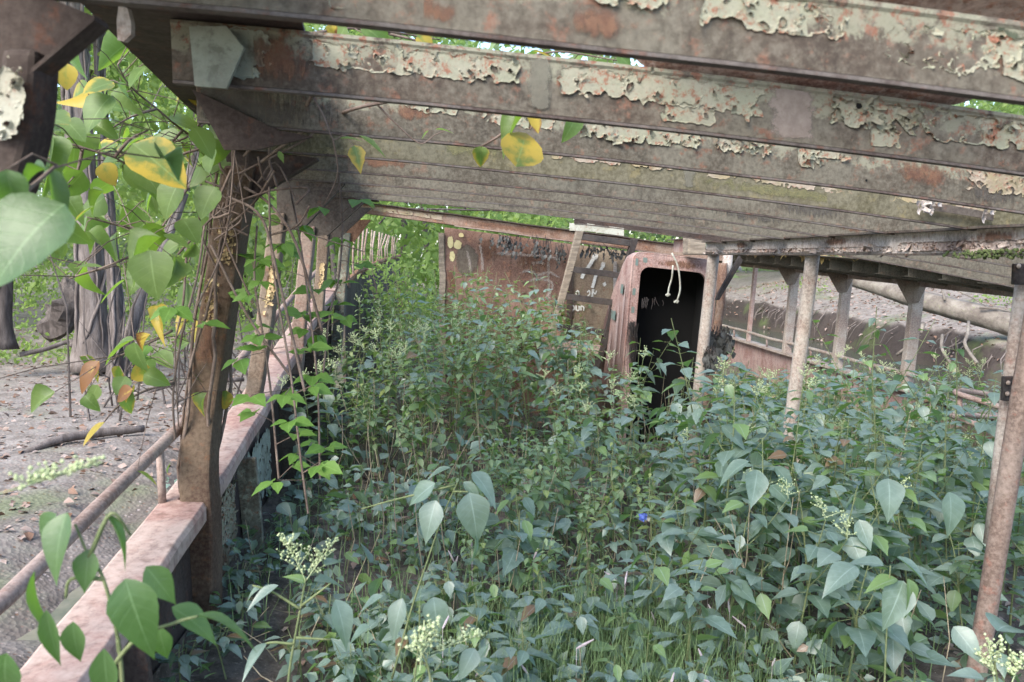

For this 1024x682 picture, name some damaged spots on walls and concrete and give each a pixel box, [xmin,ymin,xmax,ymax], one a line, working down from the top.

peeling [700,0,850,40]
peeling [309,38,520,84]
peeling [885,23,1024,82]
peeling [0,55,26,140]
peeling [556,66,766,149]
peeling [829,96,1024,150]
peeling [798,148,851,169]
peeling [966,169,1024,197]